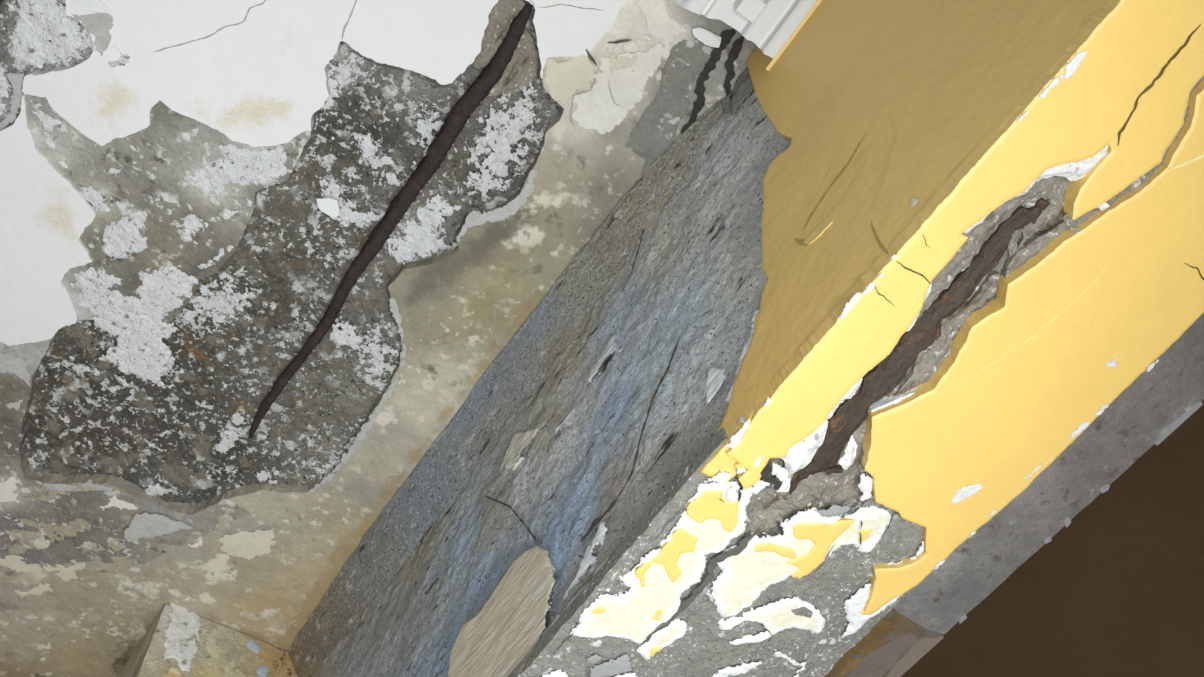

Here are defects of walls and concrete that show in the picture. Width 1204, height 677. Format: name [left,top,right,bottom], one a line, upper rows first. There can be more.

crack [155,0,266,52]
crack [1063,76,1204,234]
crack [1118,24,1201,145]
crack [871,221,932,285]
spalling [0,0,757,677]
peeling [288,67,1204,677]